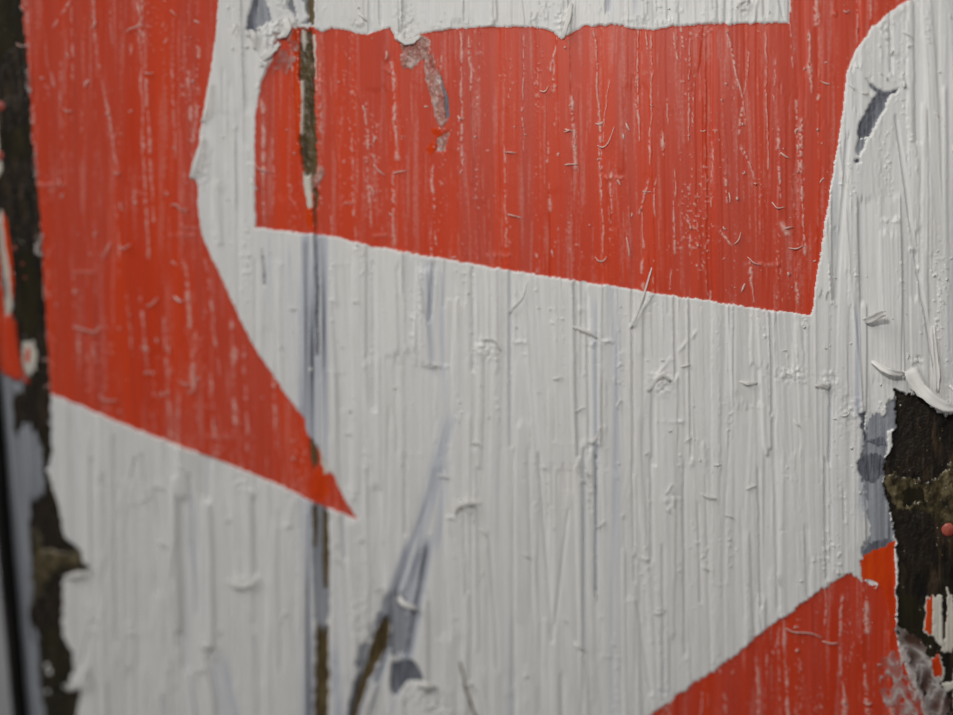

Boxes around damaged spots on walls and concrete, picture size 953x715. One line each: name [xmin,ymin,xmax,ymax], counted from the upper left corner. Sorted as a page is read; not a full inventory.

peeling [436,131,450,152]
spalling [854,81,898,163]
peeling [0,0,91,715]
peeling [857,327,953,715]